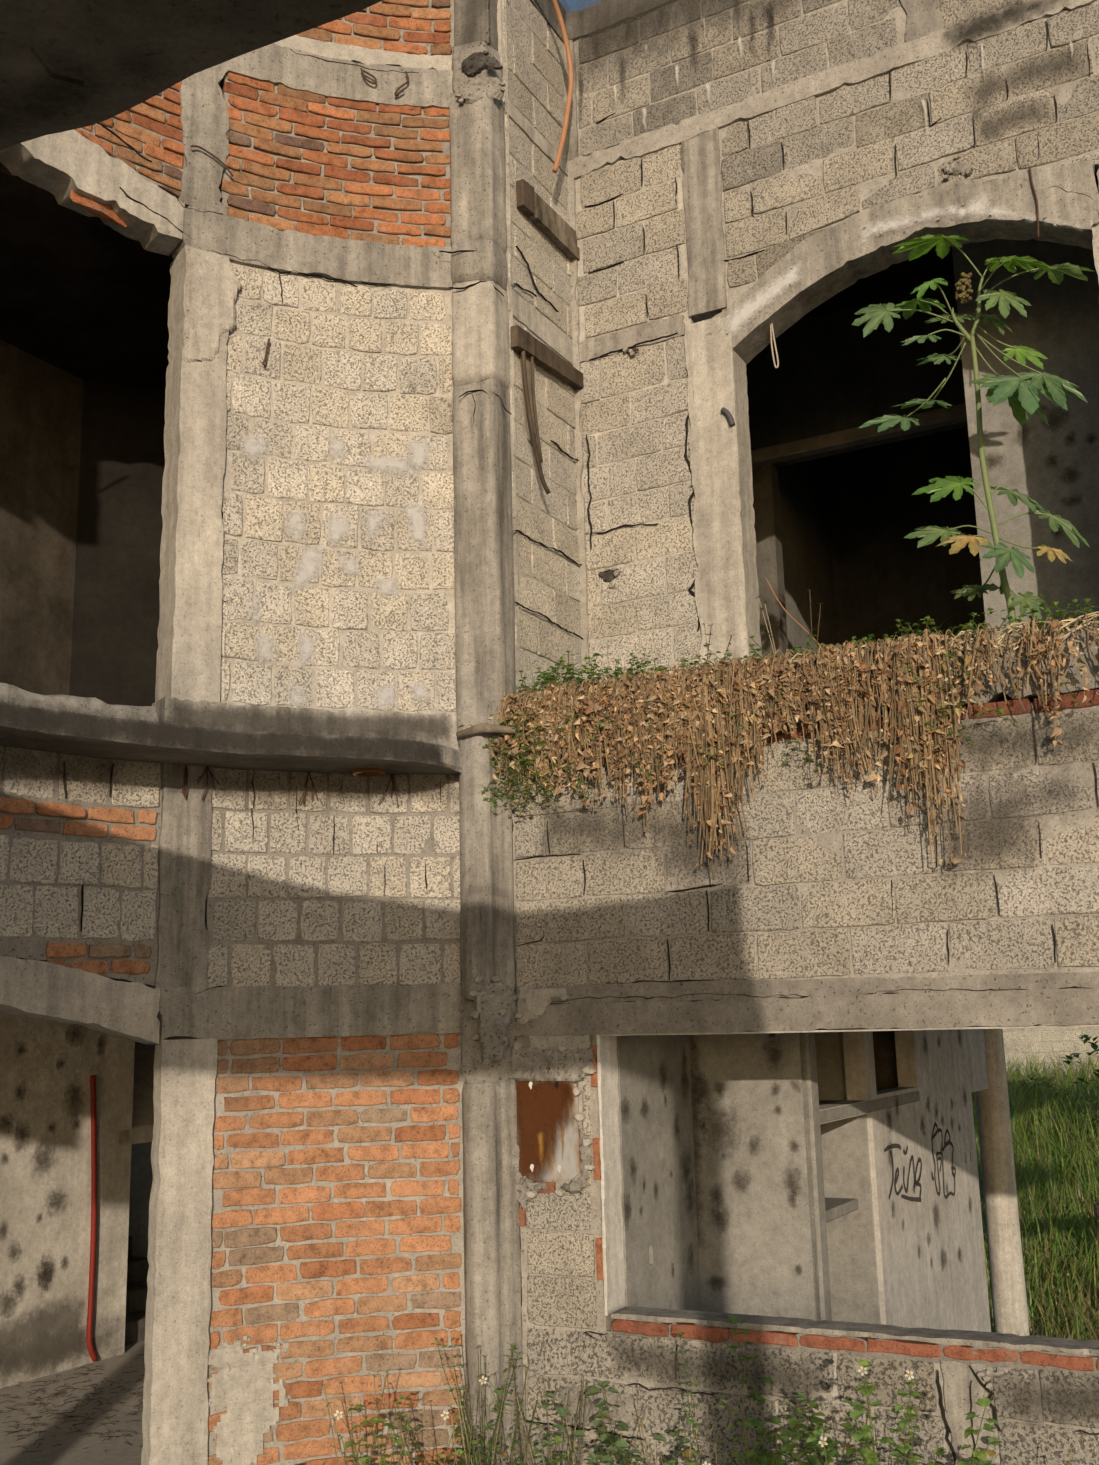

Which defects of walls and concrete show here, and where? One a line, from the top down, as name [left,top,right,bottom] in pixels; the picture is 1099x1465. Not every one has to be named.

spalling [455,50,505,104]
spalling [469,975,597,1210]
rust [515,1080,572,1183]
mould [631,1040,732,1237]
mould [39,1259,66,1287]
damp [0,1281,111,1376]
flaking render [207,1336,291,1465]